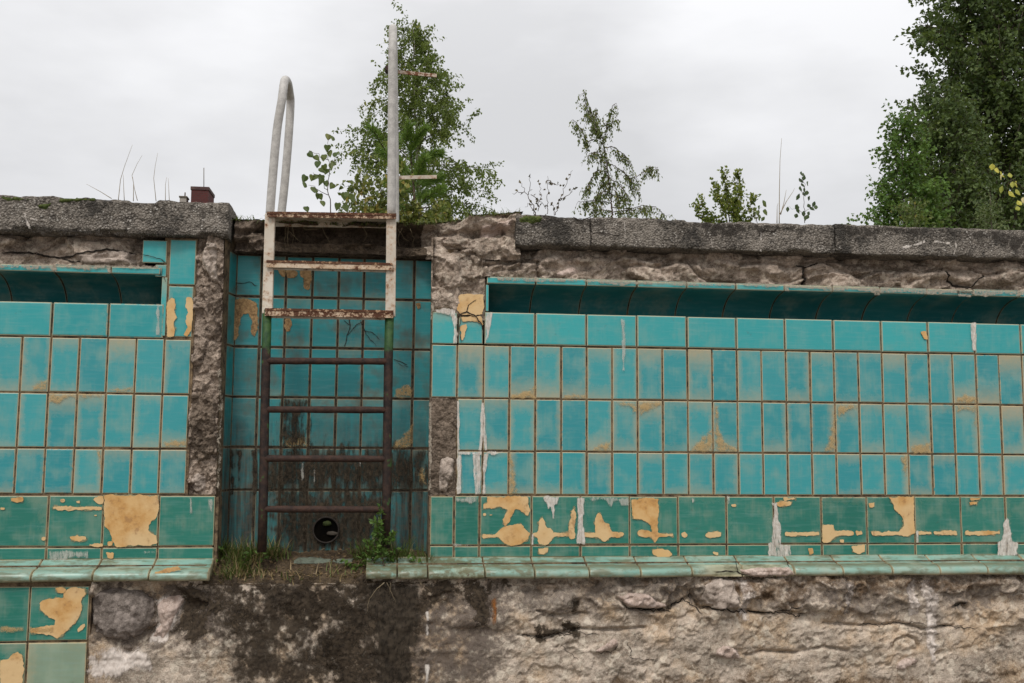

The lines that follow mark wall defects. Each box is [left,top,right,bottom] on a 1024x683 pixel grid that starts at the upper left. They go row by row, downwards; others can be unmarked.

crack [4,227,166,281]
crack [796,263,818,285]
crack [941,268,984,289]
leakage [216,370,432,552]
spalling [428,398,457,496]
peeling [52,493,160,559]
peeling [480,496,624,555]
peeling [630,497,687,557]
peeling [785,496,1000,555]
spalling [29,586,184,640]
leakage [87,581,221,677]
peeling [0,652,24,683]